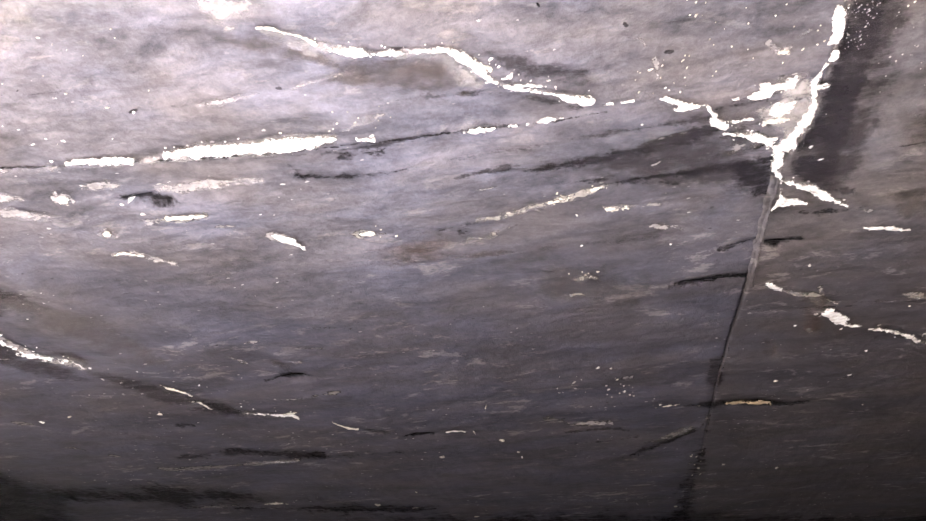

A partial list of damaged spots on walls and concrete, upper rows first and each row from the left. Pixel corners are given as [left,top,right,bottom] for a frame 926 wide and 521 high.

crack [0,27,635,173]
crack [641,5,911,232]
leakage [792,0,909,194]
peeling [266,232,306,251]
crack [765,283,926,352]
crack [0,334,137,384]
crack [160,384,212,410]
crack [241,406,299,420]